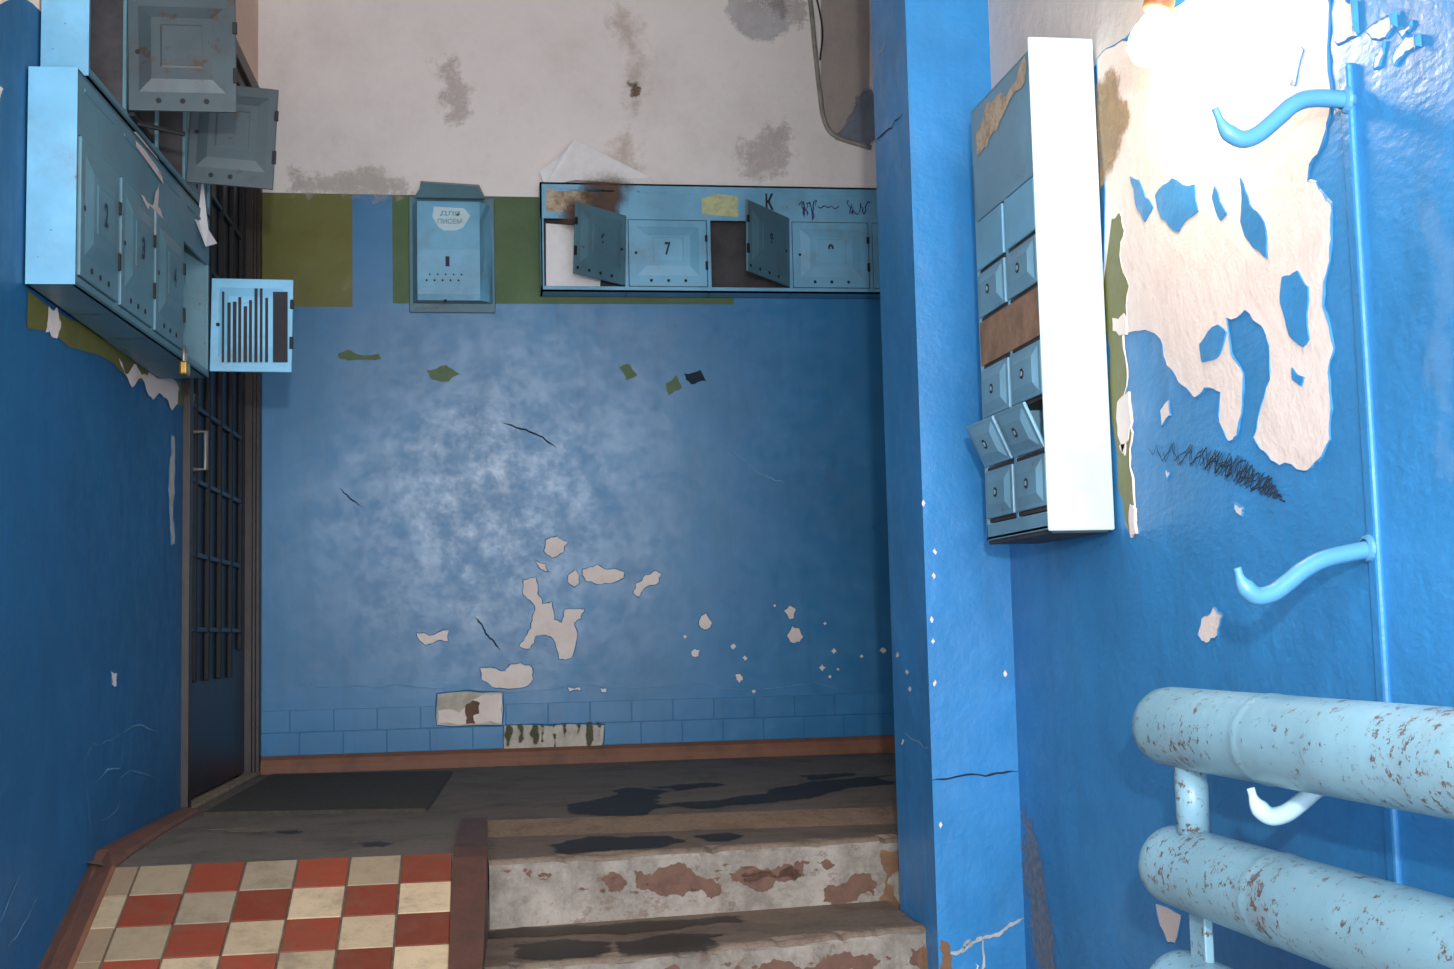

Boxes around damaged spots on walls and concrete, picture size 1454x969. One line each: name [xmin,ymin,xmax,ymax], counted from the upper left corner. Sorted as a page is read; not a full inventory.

peeling [1096,0,1422,538]
peeling [567,564,661,597]
peeling [416,629,449,646]
peeling [435,535,605,749]
peeling [698,612,712,630]
peeling [783,605,803,643]
crack [899,731,1018,781]
water stain [567,773,895,816]
water stain [551,832,744,854]
peeling [500,868,552,880]
peeling [578,850,900,910]
crack [950,918,1023,969]